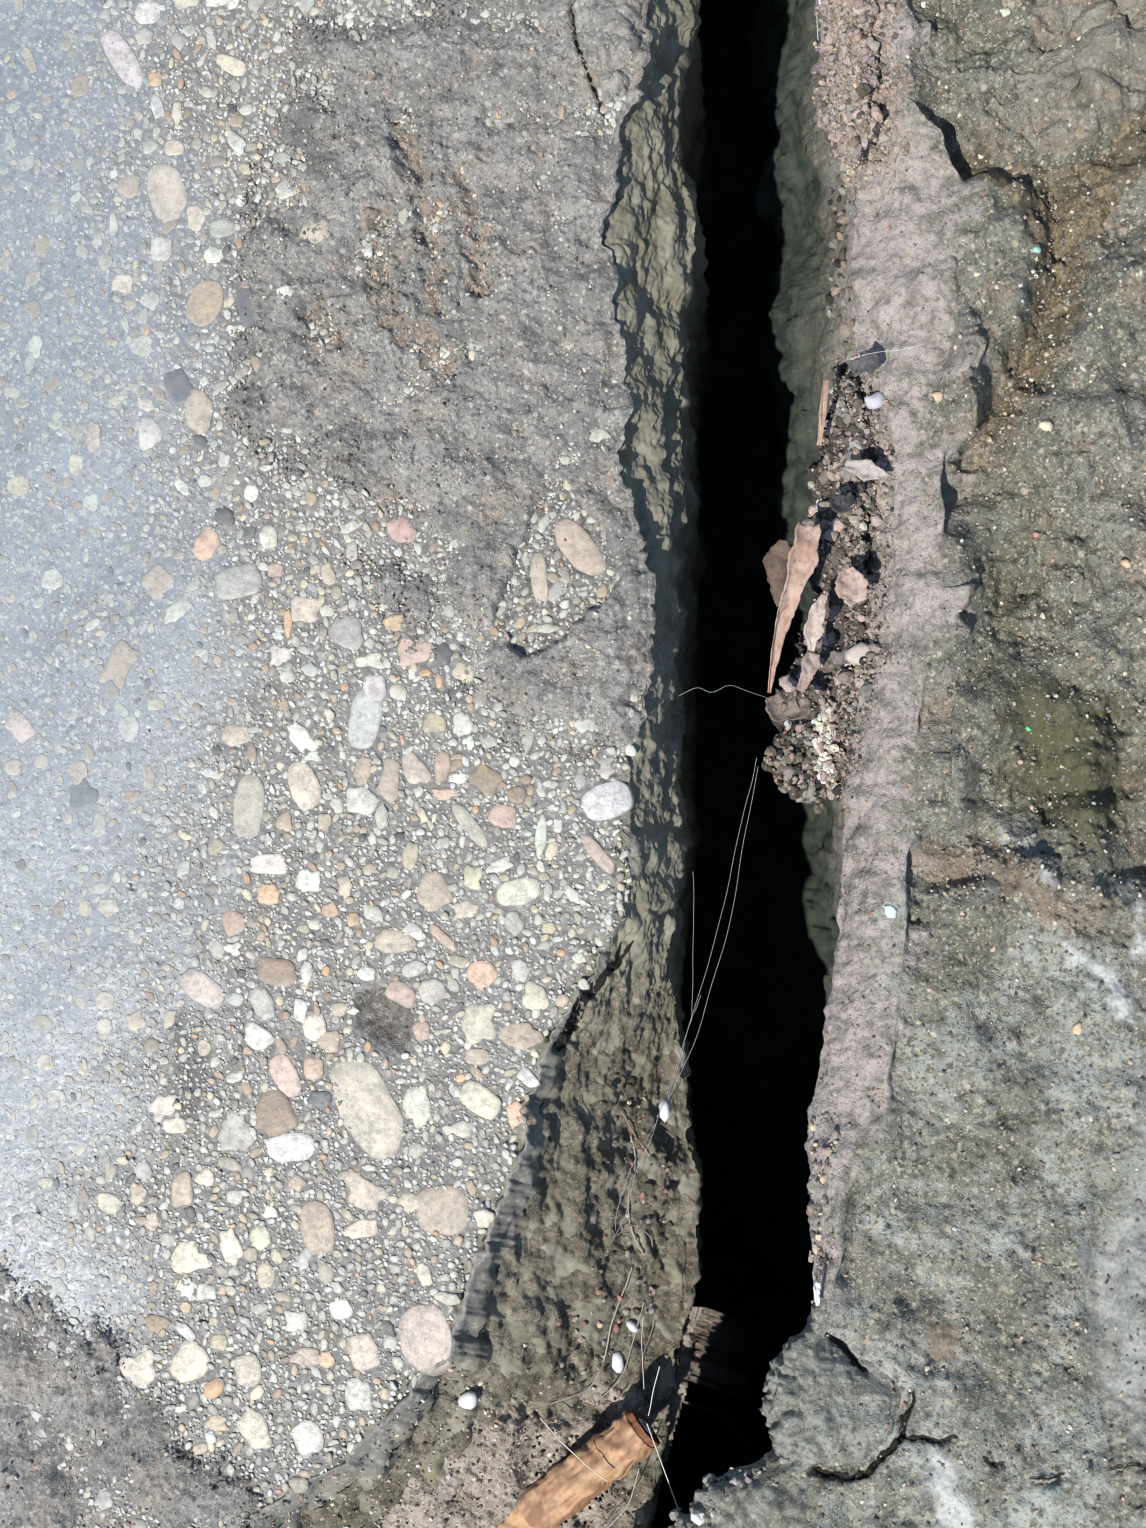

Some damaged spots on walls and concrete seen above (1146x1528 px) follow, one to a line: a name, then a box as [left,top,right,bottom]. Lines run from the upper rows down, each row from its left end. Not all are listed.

crack [570,0,608,122]
spalling [216,0,657,766]
crack [652,0,866,1528]
crack [556,941,633,1052]
spalling [0,1262,273,1528]
crack [812,1391,1065,1481]
crack [1105,1463,1146,1471]